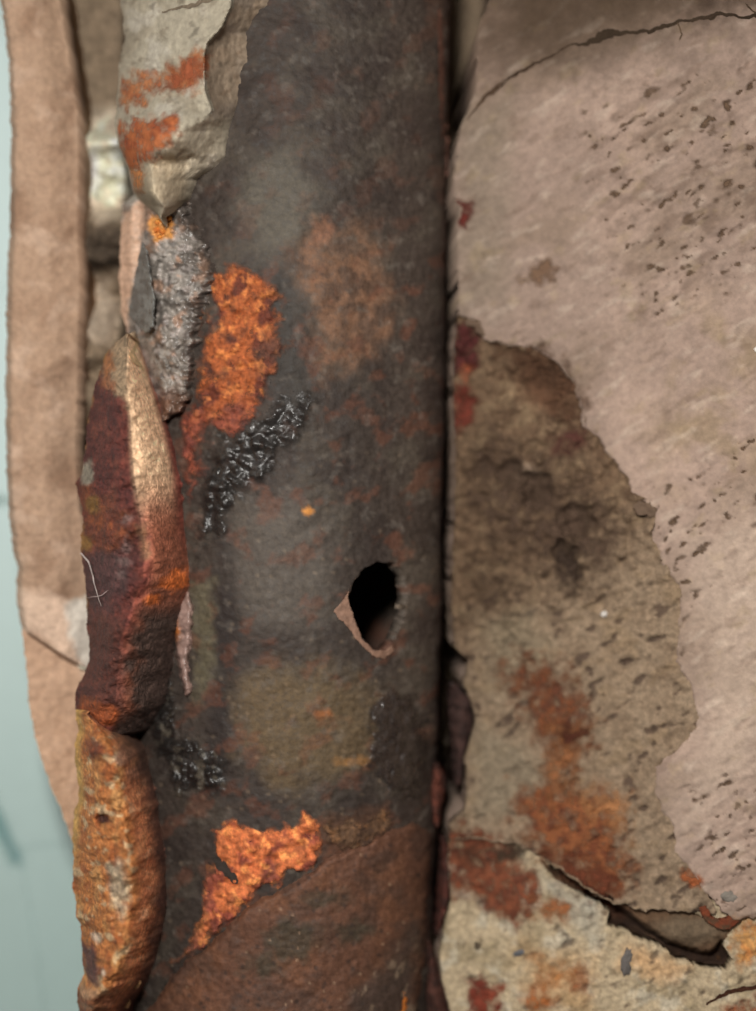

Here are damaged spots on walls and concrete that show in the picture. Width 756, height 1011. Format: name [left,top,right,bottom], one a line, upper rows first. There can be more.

corrosion [118,51,208,187]
crack [466,3,756,120]
corrosion [454,322,480,427]
corrosion [72,264,283,1011]
spalling [438,315,756,1011]
corrosion [146,652,639,1011]
crack [541,855,614,901]
corrosion [735,921,756,962]